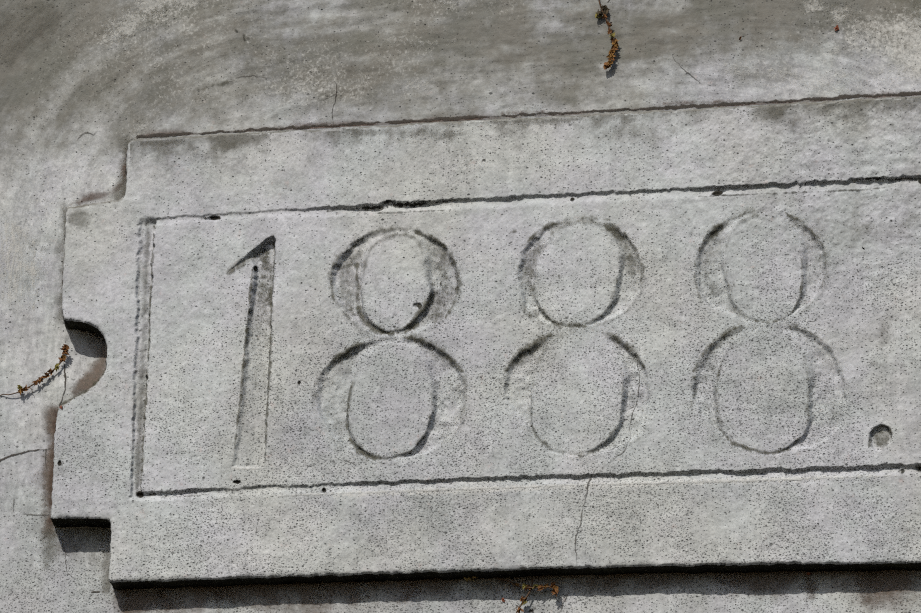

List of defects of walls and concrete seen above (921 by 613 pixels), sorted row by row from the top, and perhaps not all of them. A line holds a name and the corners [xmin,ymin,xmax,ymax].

crack [0,448,50,464]
crack [560,366,640,611]